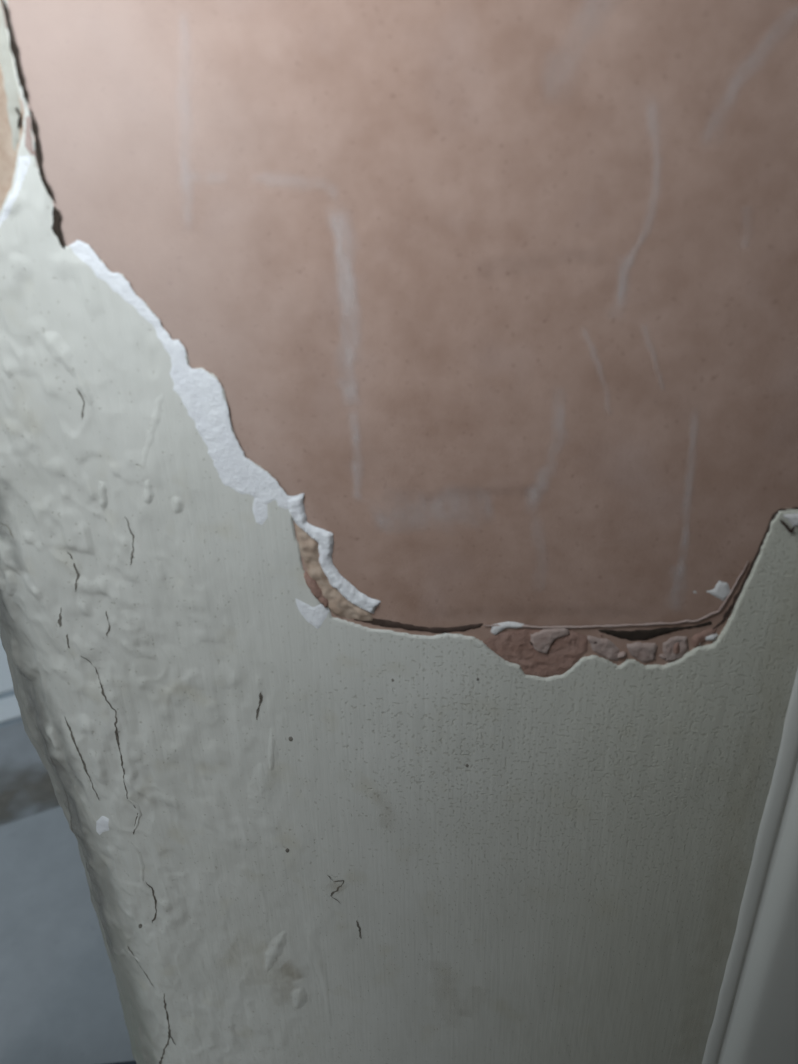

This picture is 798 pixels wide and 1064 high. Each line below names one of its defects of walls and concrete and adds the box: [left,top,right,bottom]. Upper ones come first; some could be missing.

peeling [0,0,798,677]
crack [67,552,80,592]
crack [125,517,134,565]
crack [255,692,263,719]
crack [58,612,157,922]
crack [120,947,176,1064]